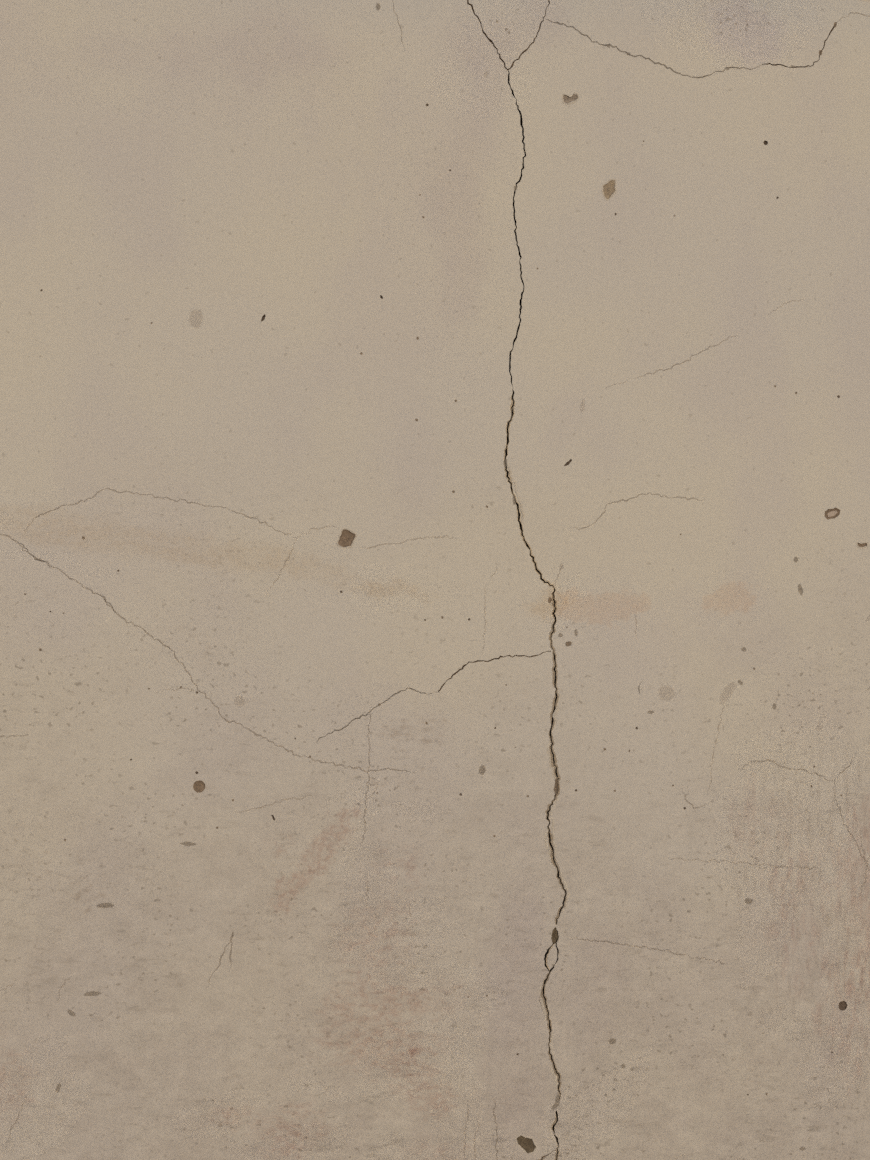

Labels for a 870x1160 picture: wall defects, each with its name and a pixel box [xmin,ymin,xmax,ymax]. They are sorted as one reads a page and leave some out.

crack [438,0,570,1160]
crack [762,25,835,68]